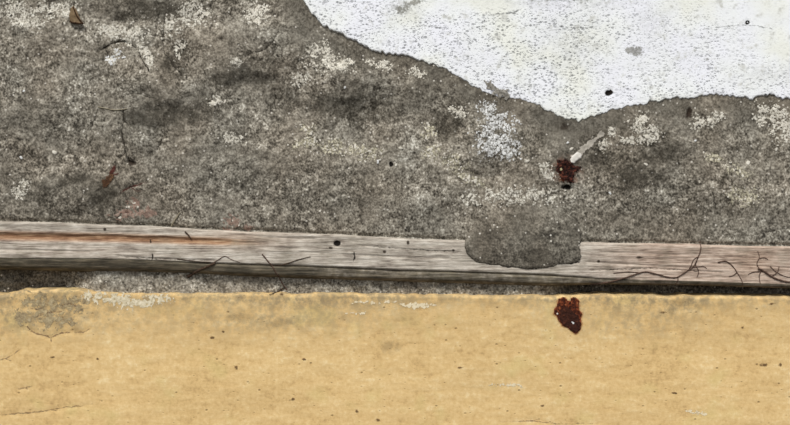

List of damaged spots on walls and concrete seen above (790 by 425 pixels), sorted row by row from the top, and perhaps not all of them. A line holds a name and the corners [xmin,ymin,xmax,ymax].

spalling [0,0,790,246]
corrosion [556,159,582,183]
spalling [0,270,790,335]
corrosion [554,297,582,334]